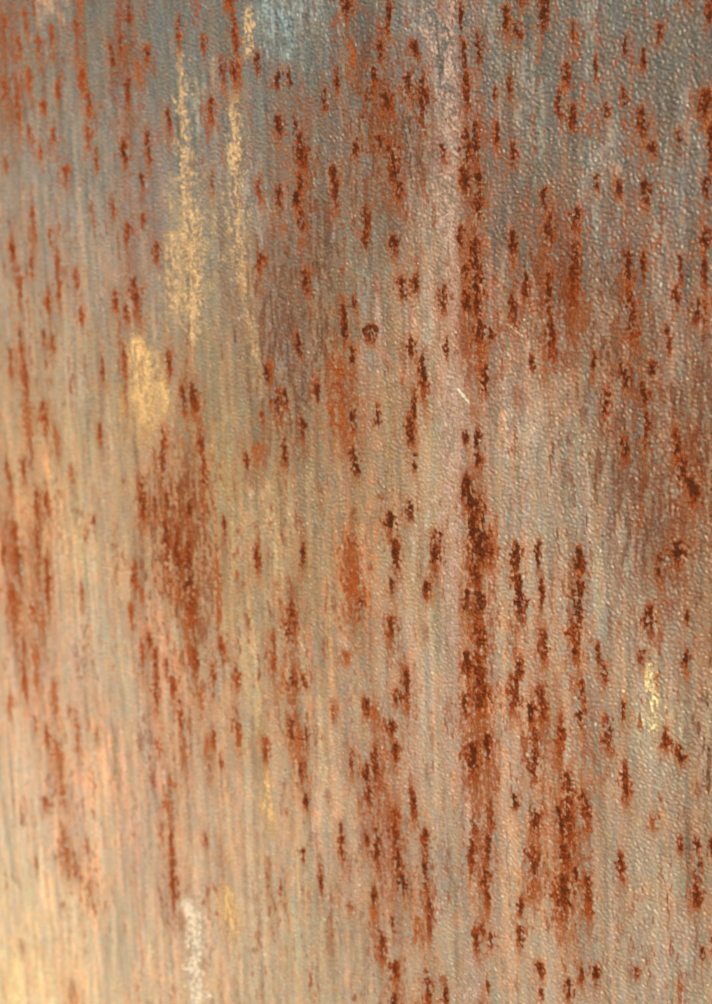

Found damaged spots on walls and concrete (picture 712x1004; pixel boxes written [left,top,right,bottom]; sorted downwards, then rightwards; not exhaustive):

rust [255,112,311,231]
rust [364,0,432,128]
rust [439,1,489,224]
rust [437,224,496,398]
rust [539,186,583,365]
rust [1,517,59,717]
rust [135,381,242,711]
rust [348,695,402,807]
rust [379,499,419,597]
rust [457,428,595,958]
rust [600,700,634,806]
rust [363,786,438,943]